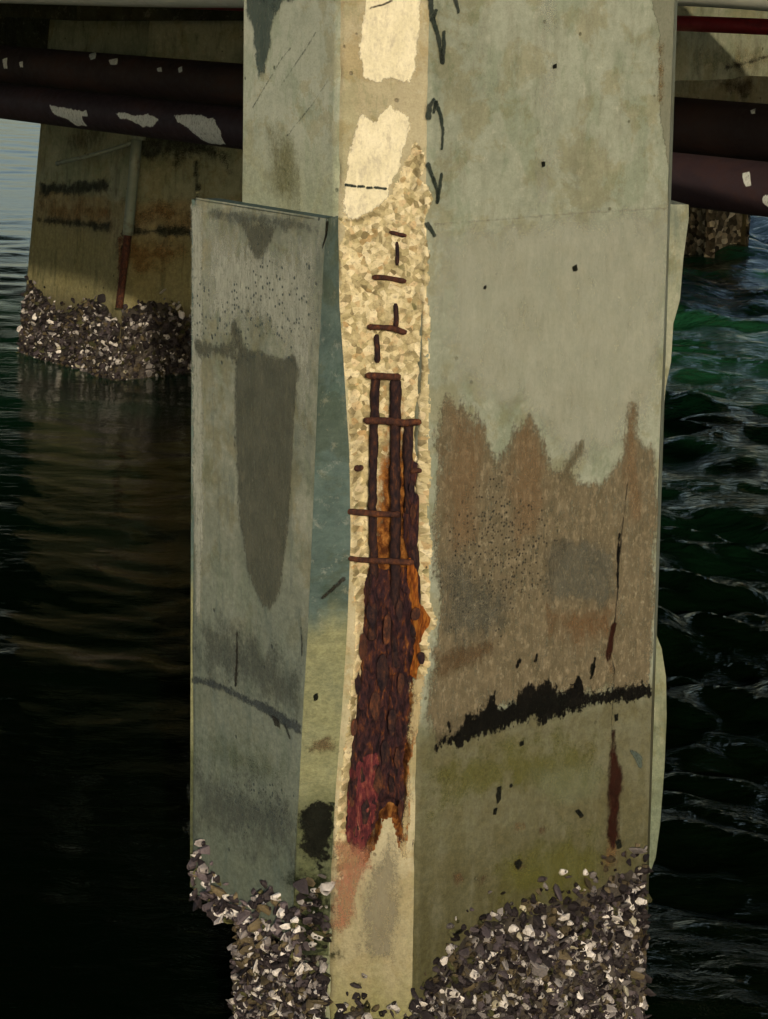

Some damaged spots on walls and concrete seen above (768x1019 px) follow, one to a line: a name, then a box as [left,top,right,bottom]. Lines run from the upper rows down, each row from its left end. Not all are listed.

damp [247,0,290,76]
peeling [358,0,421,84]
peeling [50,105,88,126]
peeling [117,112,158,127]
peeling [174,114,226,145]
damp [39,179,109,197]
damp [188,211,317,610]
damp [423,216,665,747]
spalling [298,105,438,958]
corrosion [408,673,425,744]
corrosion [400,777,410,858]
corrosion [607,730,623,856]